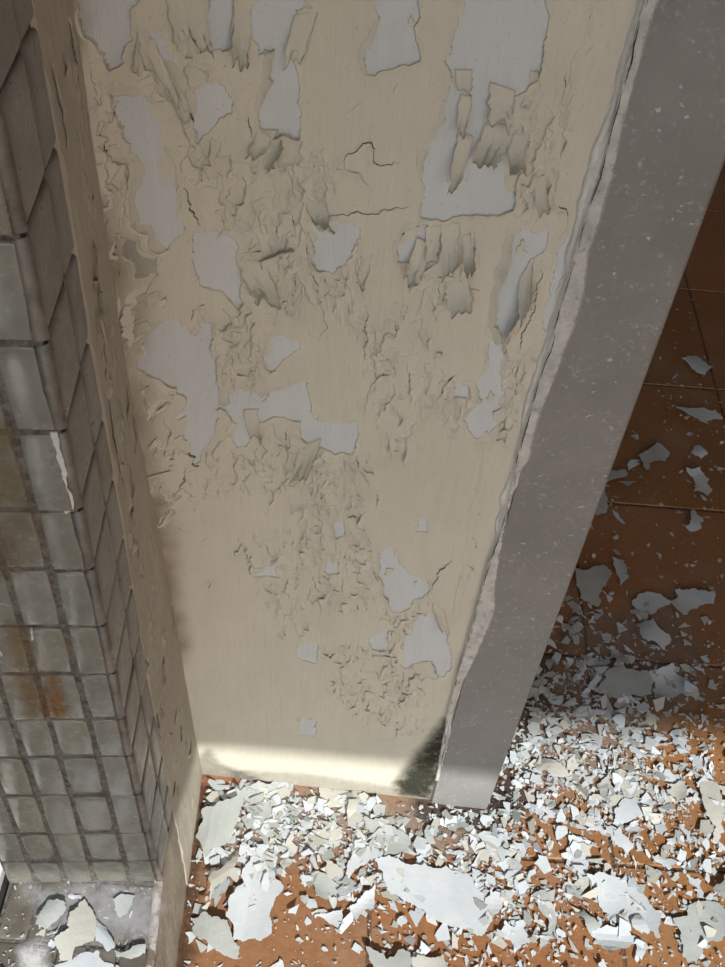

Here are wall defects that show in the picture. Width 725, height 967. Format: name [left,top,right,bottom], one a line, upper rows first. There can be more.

peeling [72,0,378,530]
peeling [357,0,426,79]
crack [427,561,454,598]
peeling [392,0,577,449]
crack [451,0,648,704]
peeling [596,469,628,516]